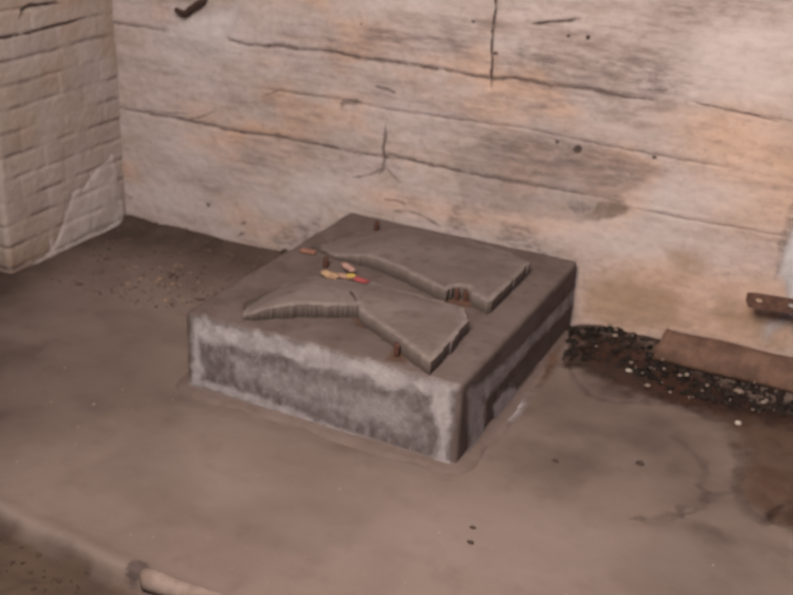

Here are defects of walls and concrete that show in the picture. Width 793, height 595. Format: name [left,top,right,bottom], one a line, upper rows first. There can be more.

crack [228,0,550,86]
crack [125,108,338,149]
crack [362,91,398,174]
crack [574,86,645,99]
crack [411,158,625,202]
damp [767,231,793,332]
rust [565,335,793,431]
damp [733,418,793,526]